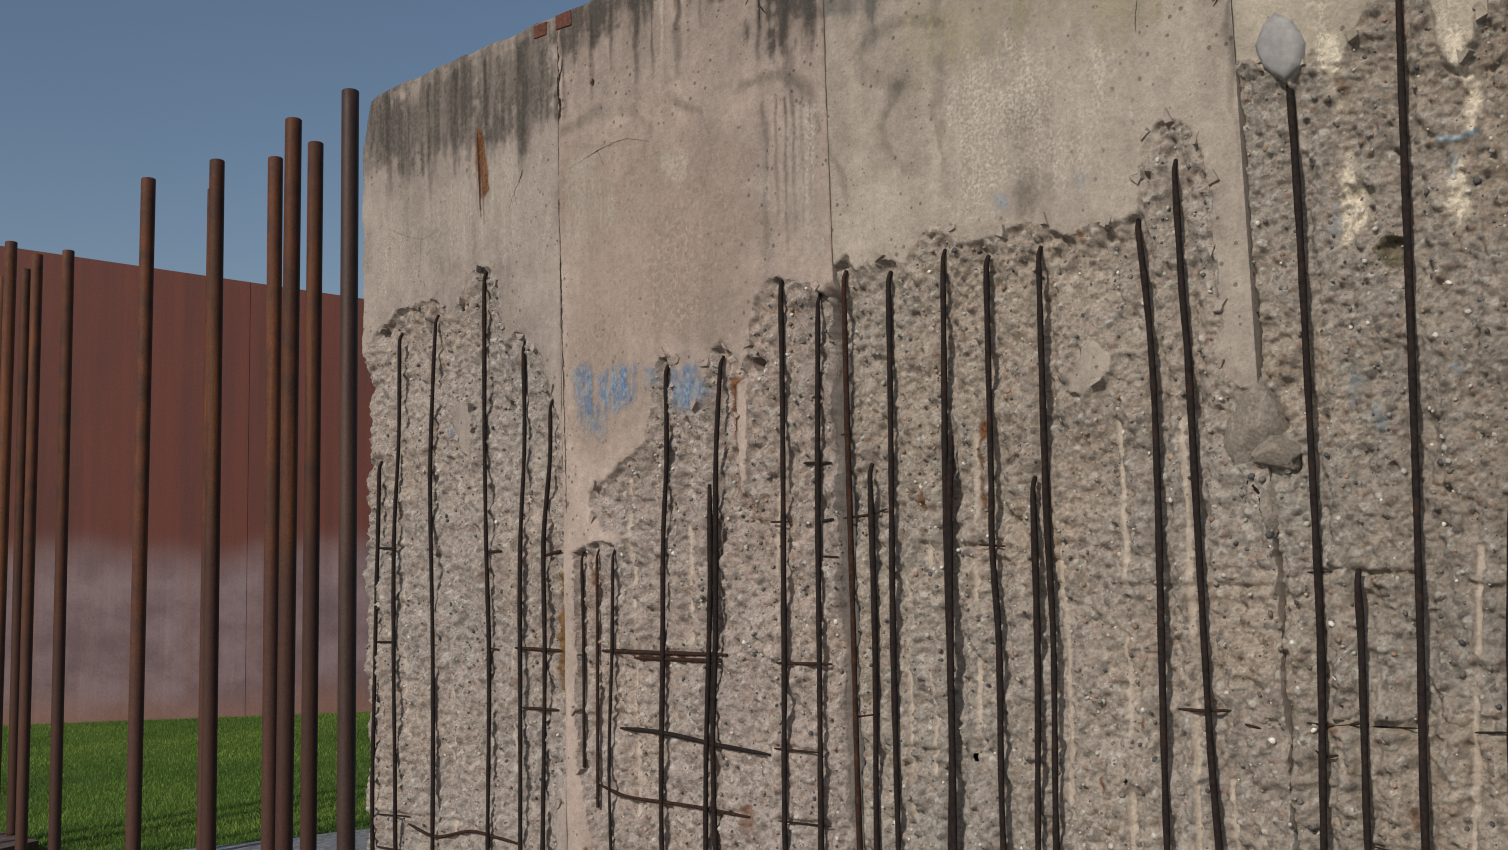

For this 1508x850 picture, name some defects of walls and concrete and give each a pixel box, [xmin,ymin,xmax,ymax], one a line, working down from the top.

rust [476,130,488,198]
damp [369,0,680,173]
damp [745,0,849,54]
spalling [362,0,1508,850]